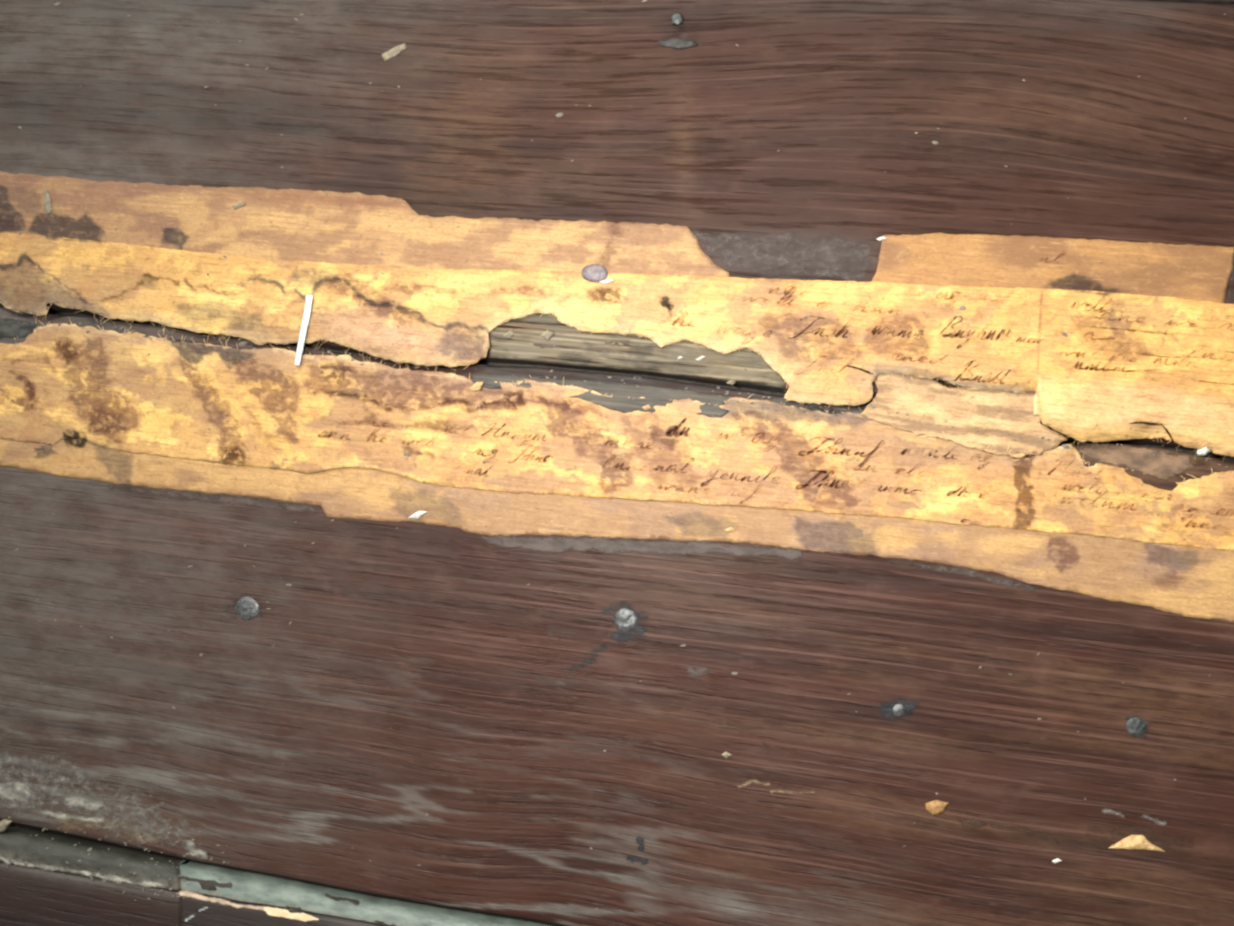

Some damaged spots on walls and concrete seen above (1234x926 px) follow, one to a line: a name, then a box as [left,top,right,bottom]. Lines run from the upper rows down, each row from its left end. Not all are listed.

crack [47,303,788,397]
crack [822,365,873,406]
crack [933,379,970,388]
crack [1058,432,1234,462]